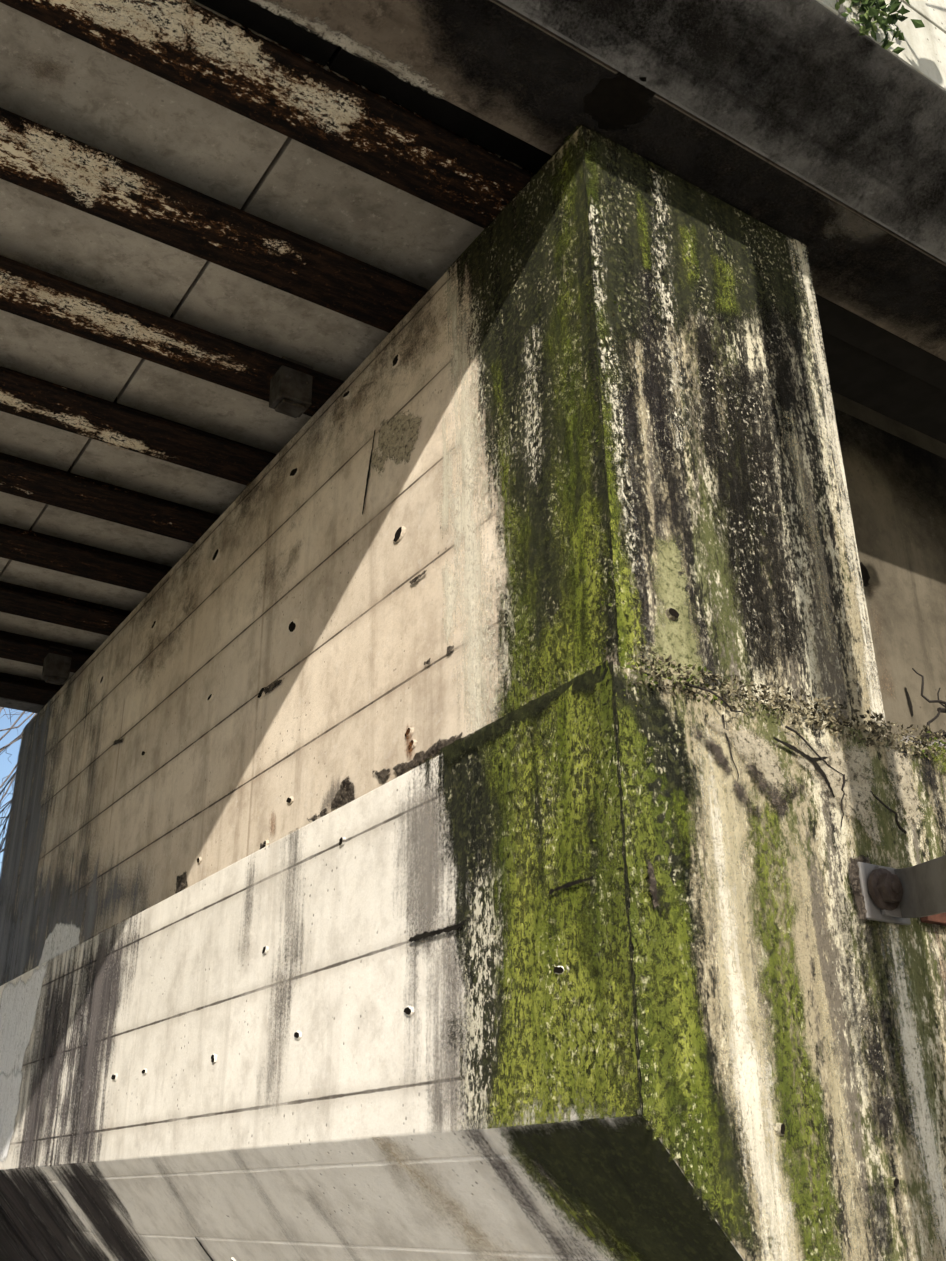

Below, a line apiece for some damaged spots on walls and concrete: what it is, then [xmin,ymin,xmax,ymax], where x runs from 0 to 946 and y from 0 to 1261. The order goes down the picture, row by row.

peeling [0,117,193,208]
peeling [71,0,369,136]
peeling [0,390,175,459]
peeling [0,270,246,373]
peeling [370,410,420,473]
water stain [250,0,946,732]
spalling [856,558,870,587]
water stain [0,677,156,1261]
water stain [268,828,303,1084]
water stain [398,787,642,1261]
water stain [697,731,803,1261]
water stain [819,894,946,1261]